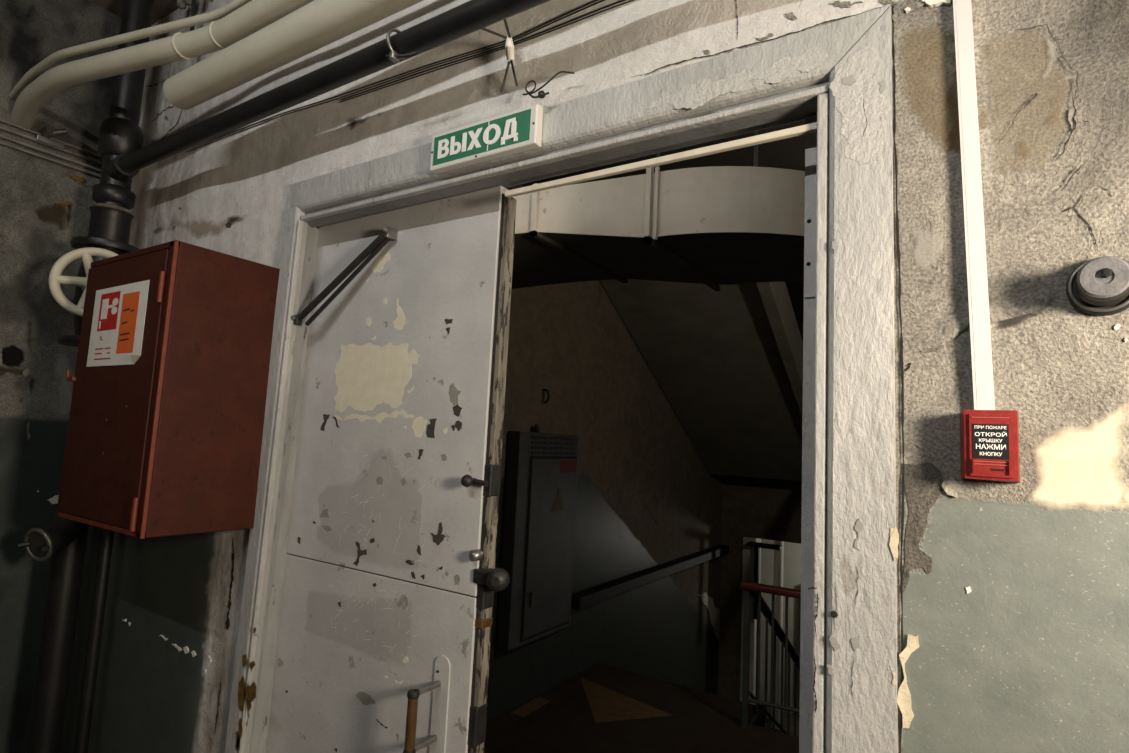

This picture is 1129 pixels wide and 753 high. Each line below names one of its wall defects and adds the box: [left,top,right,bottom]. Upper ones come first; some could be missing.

peeling [880,0,953,23]
water stain [948,54,960,147]
crack [997,93,1038,144]
crack [1017,24,1112,250]
peeling [889,462,964,593]
corrosion [235,655,257,753]
peeling [892,635,919,728]